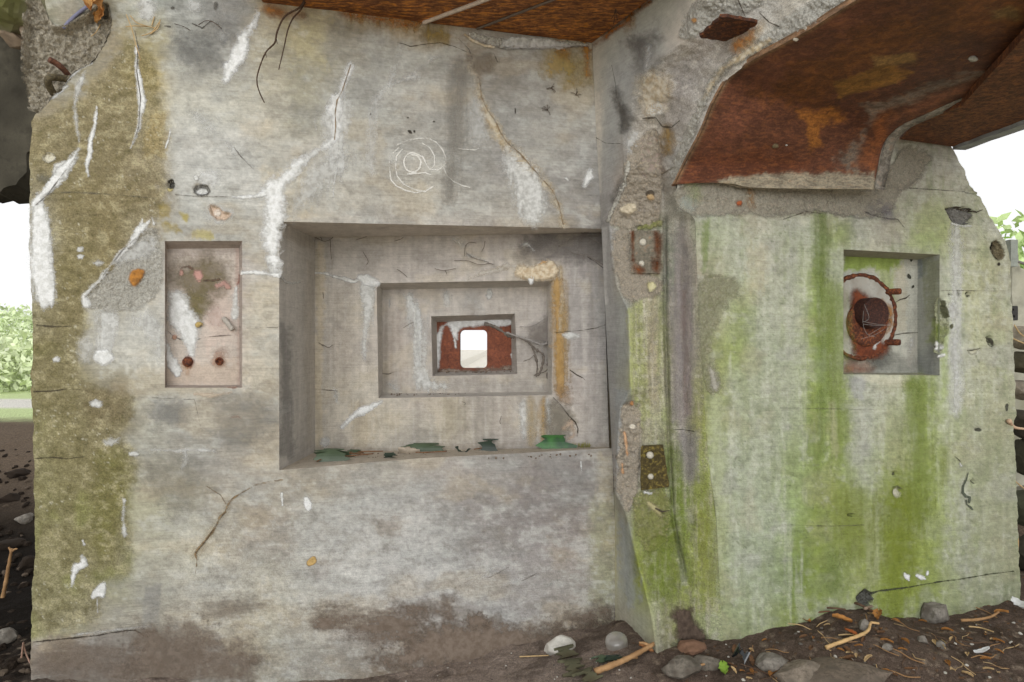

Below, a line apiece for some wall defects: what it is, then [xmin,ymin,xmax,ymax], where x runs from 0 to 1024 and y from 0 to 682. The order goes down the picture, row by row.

spalling [21,0,111,113]
water stain [29,74,98,308]
spalling [82,219,162,312]
crack [480,83,565,226]
corrosion [631,231,661,273]
spalling [606,0,932,302]
corrosion [851,289,868,309]
spalling [945,207,982,226]
corrosion [520,266,579,439]
water stain [71,540,88,585]
water stain [91,583,106,612]
crack [194,479,282,573]